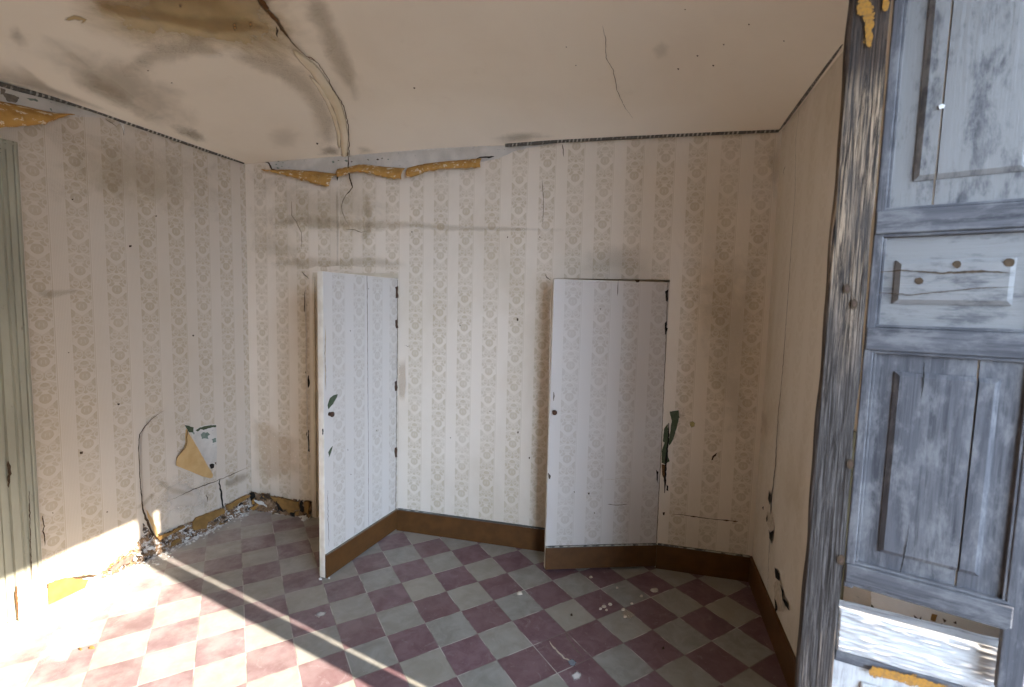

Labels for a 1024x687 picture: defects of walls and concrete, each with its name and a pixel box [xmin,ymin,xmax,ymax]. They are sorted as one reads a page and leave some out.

damp [110,0,278,48]
flaking render [0,87,98,116]
crack [258,0,365,232]
crack [603,29,632,117]
flaking render [264,144,544,180]
crack [138,411,163,536]
crack [174,470,241,508]
peeling [47,492,310,605]